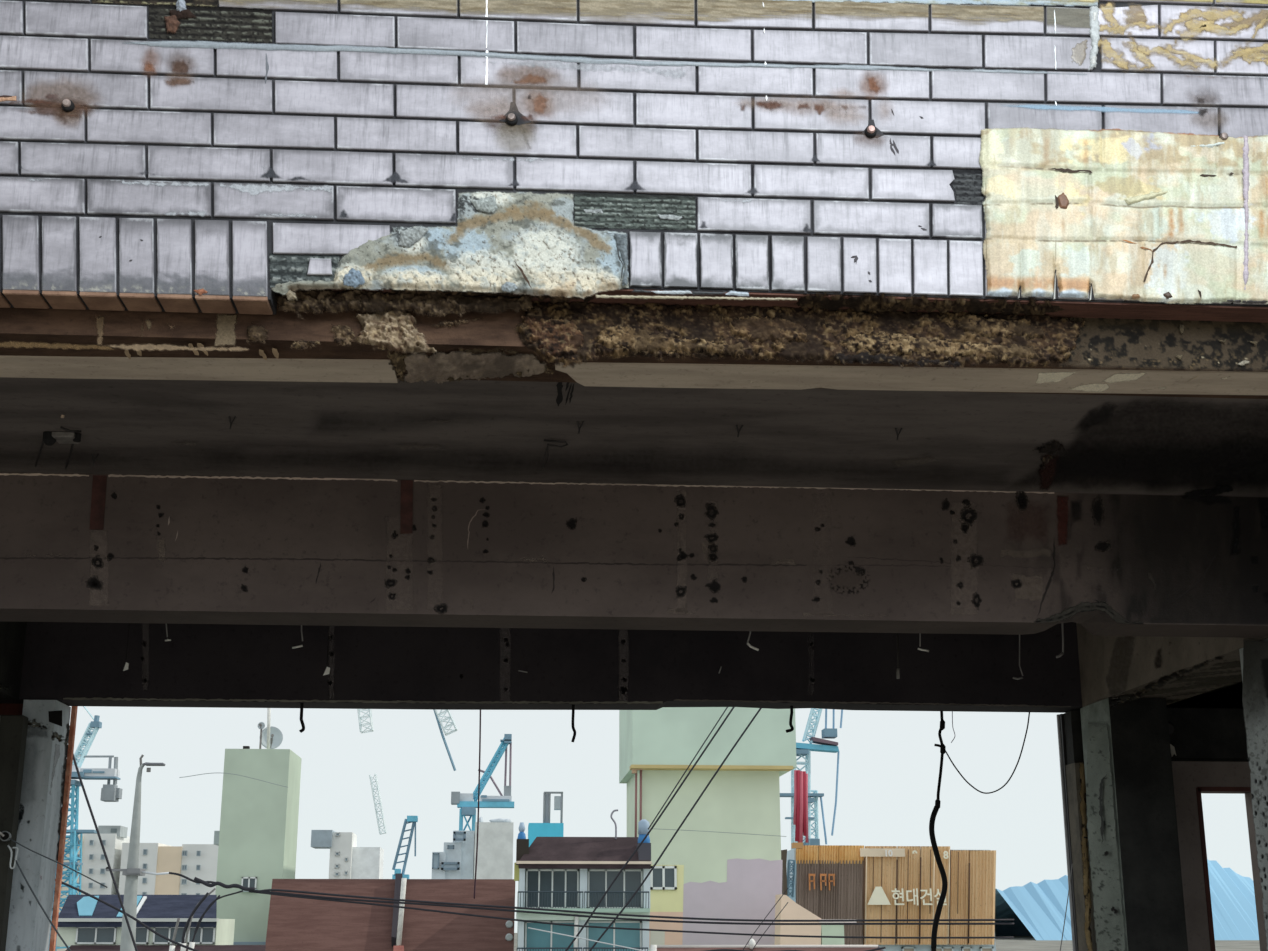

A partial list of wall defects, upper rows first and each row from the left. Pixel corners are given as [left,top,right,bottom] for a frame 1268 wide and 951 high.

peeling [92,0,272,43]
corrosion [10,86,89,122]
corrosion [166,60,190,85]
corrosion [489,69,550,132]
corrosion [741,102,831,114]
corrosion [865,78,883,92]
peeling [270,127,1268,392]
crack [1123,240,1237,282]
spalling [246,325,269,343]
corrosion [1035,440,1081,545]
leakage [1021,403,1268,624]